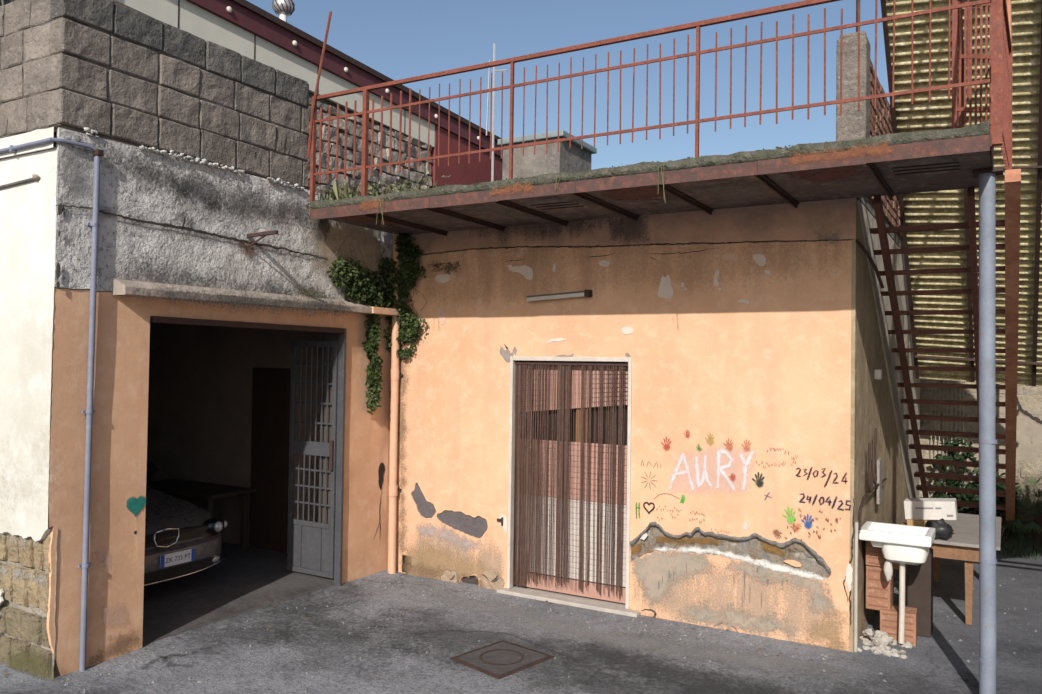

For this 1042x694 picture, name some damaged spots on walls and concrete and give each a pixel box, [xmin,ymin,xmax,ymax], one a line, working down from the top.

leakage [56,134,384,316]
rust [344,200,397,227]
rust [599,186,669,200]
peeling [507,265,533,280]
peeling [657,275,687,298]
peeling [410,481,508,540]
flaking render [630,521,831,581]
flaking render [0,528,60,679]